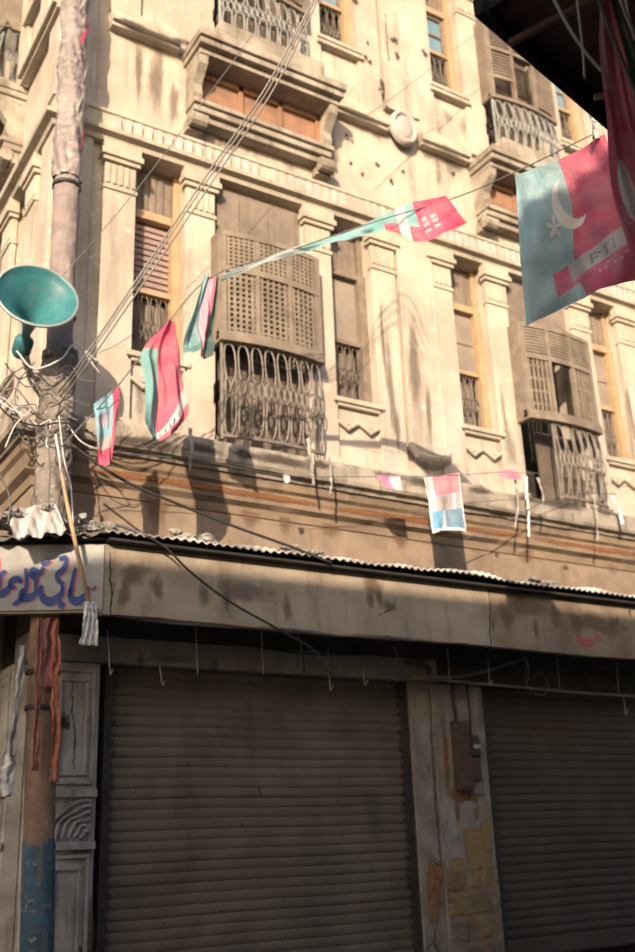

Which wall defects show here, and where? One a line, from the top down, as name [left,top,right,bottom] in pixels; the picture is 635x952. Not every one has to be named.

water stain [136,53,161,97]
crack [107,554,115,614]
water stain [119,567,141,603]
water stain [366,578,394,609]
water stain [501,597,616,637]
crack [68,673,76,770]
spalling [427,801,505,952]